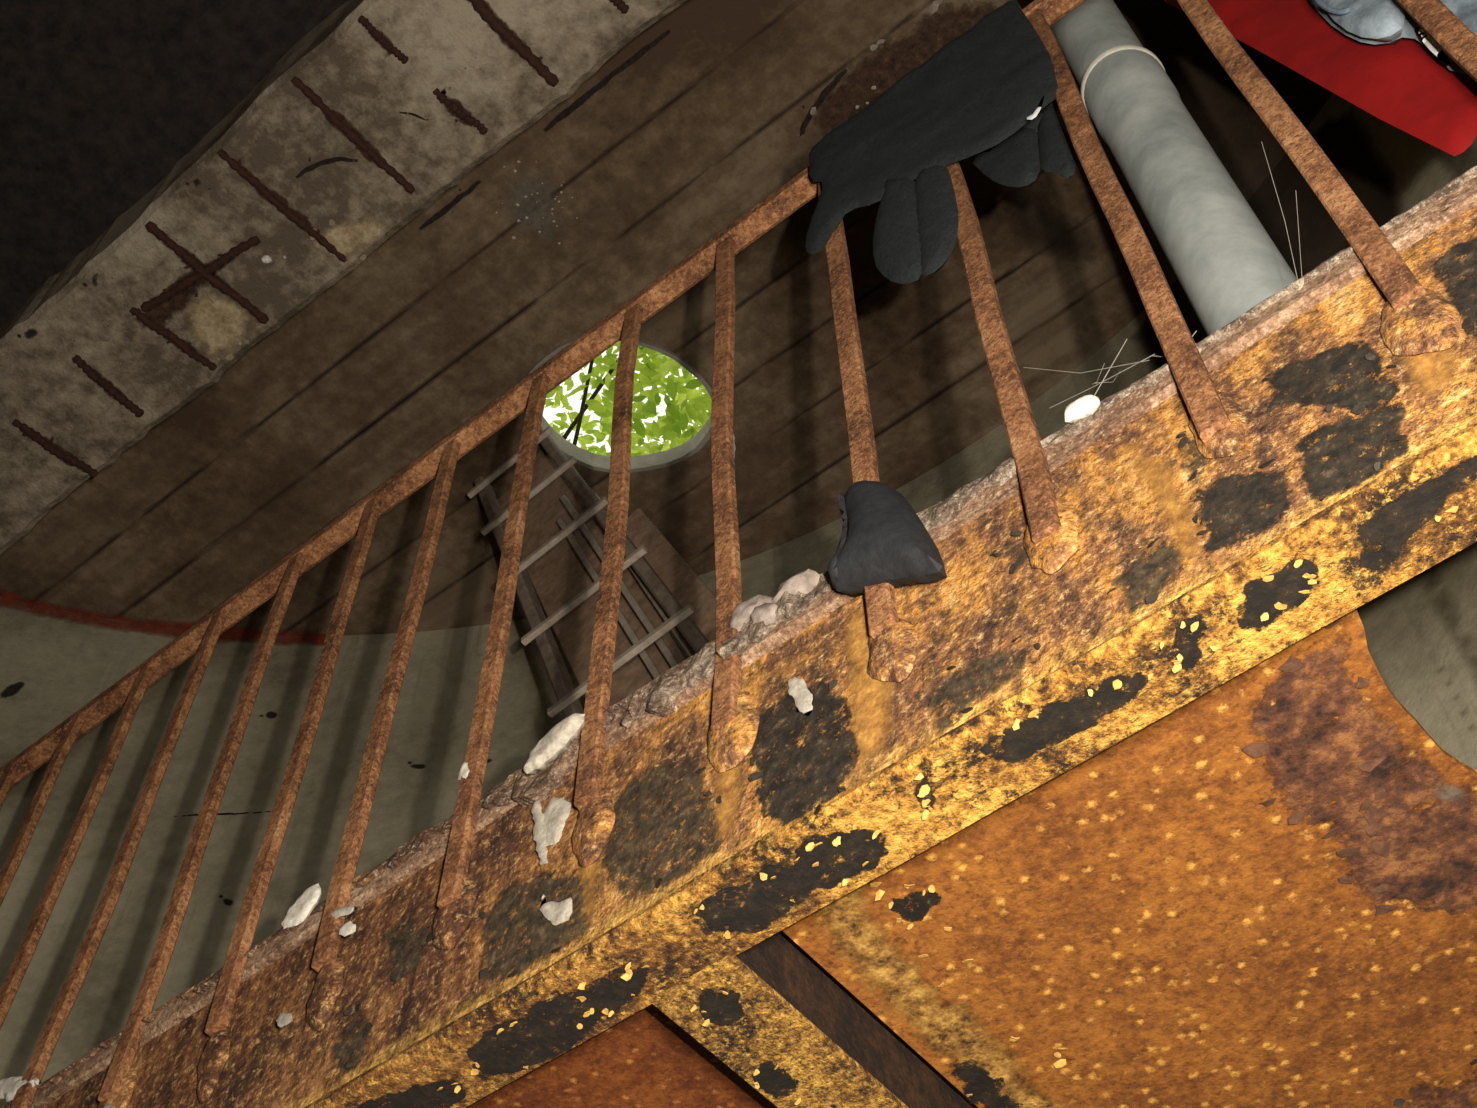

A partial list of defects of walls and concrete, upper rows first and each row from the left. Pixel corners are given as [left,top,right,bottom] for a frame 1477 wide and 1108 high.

rust [1406,350,1449,394]
rust [0,592,194,637]
rust [218,627,326,645]
rust [848,610,889,757]
rust [715,766,739,837]
rust [575,861,600,925]
rust [815,872,1058,1108]
rust [1053,1048,1067,1068]